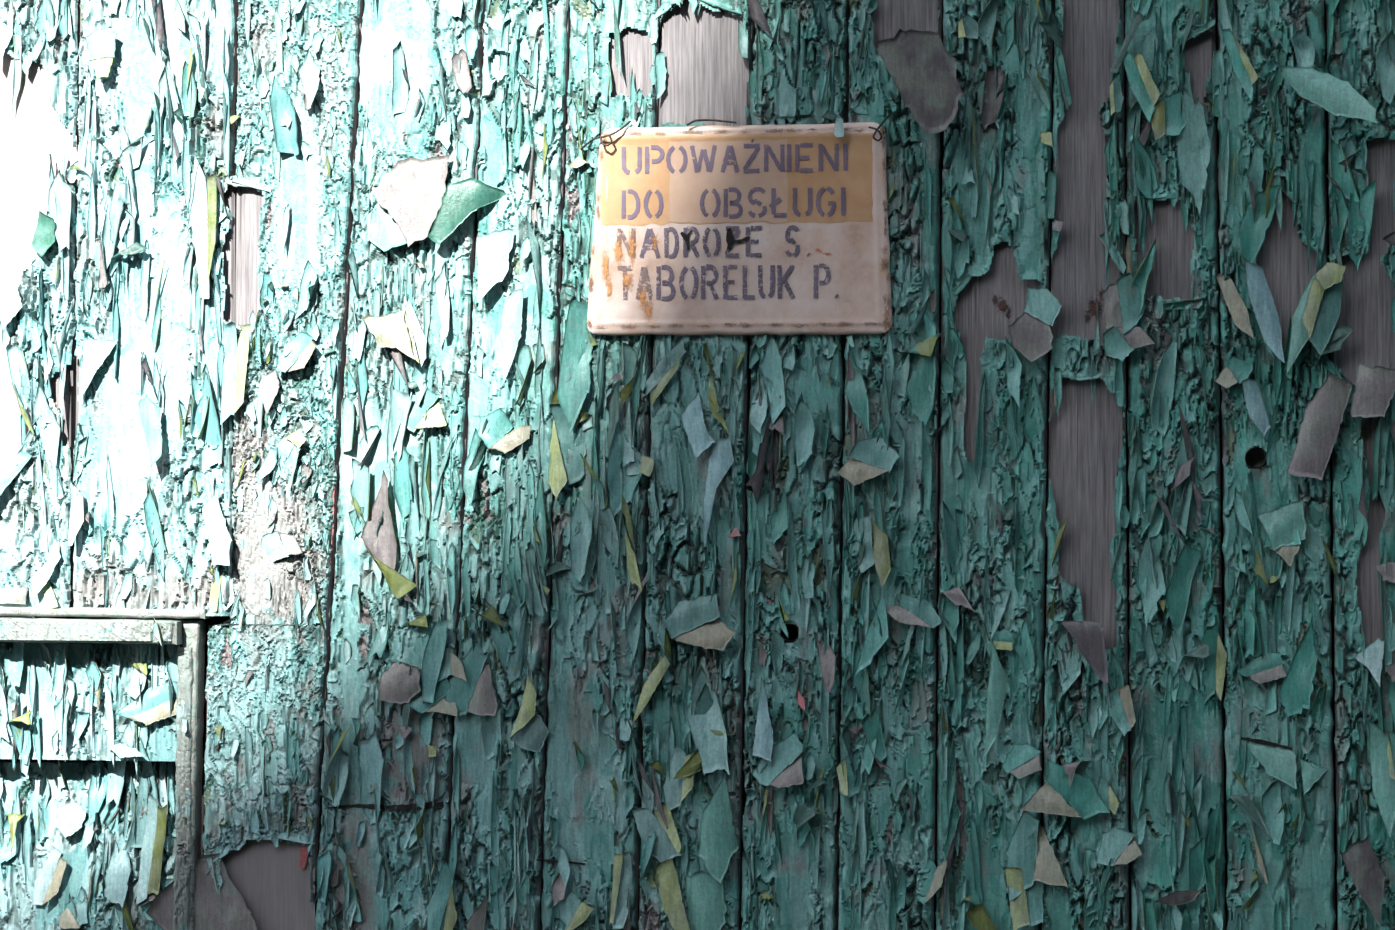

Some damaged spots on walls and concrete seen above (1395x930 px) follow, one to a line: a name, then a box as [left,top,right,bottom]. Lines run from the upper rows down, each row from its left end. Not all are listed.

peeling [0,0,847,930]
peeling [741,0,1395,930]